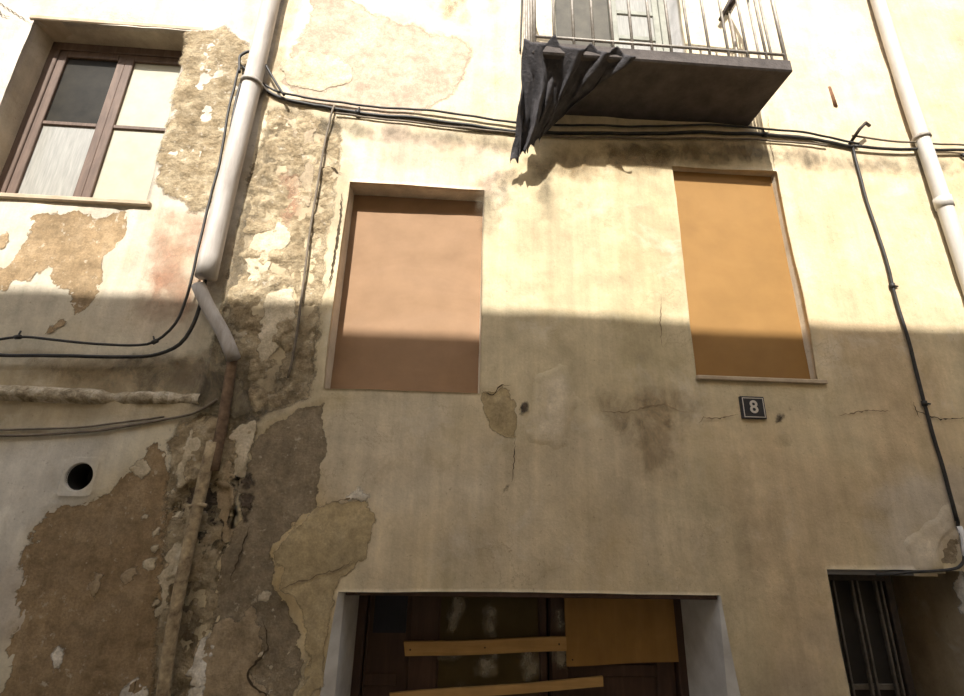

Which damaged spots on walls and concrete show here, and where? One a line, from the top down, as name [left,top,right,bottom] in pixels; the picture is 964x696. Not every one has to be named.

flaking render [0,0,472,696]
flaking render [481,384,528,487]
crack [913,402,962,421]
flaking render [903,502,964,614]